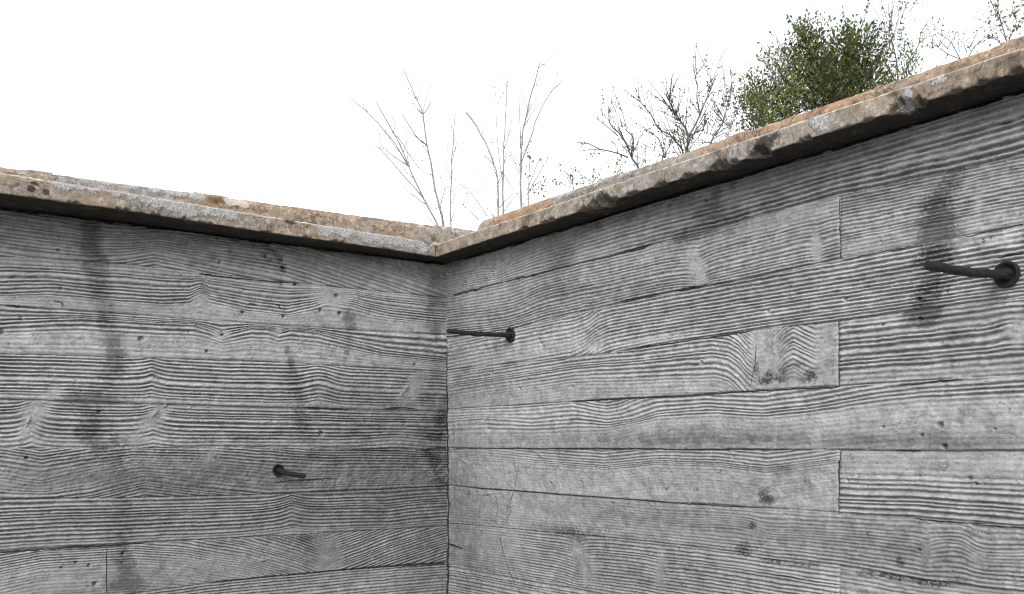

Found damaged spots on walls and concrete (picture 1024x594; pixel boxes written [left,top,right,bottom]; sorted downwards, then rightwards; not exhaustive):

leakage [81,222,123,376]
leakage [904,166,965,329]
leakage [58,393,120,449]